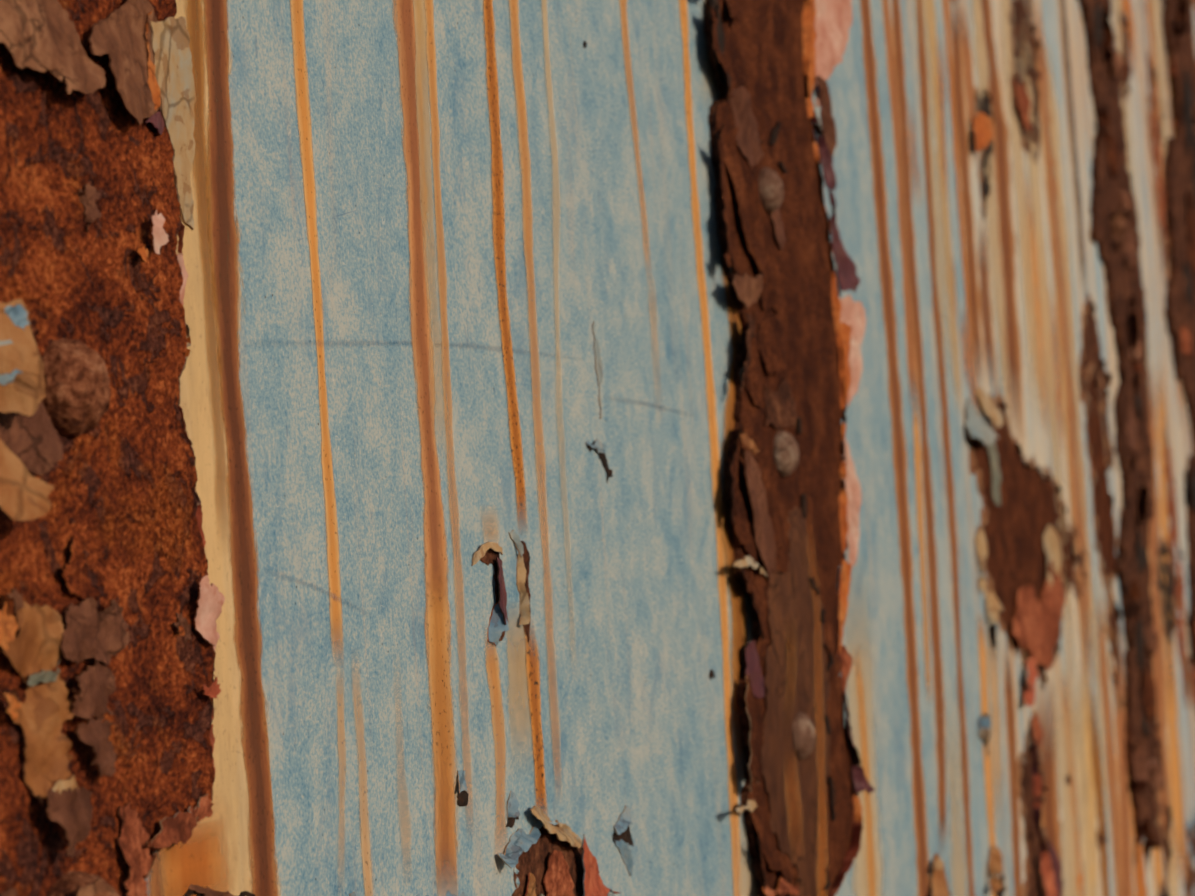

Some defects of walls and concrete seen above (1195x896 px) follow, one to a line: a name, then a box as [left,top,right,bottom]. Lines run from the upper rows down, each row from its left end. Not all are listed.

peeling [0,298,64,521]
corrosion [0,535,129,857]
peeling [0,0,196,305]
corrosion [116,0,281,896]
peeling [195,490,206,548]
corrosion [394,0,458,875]
peeling [471,530,531,646]
corrosion [484,0,546,511]
peeling [497,790,620,896]
corrosion [679,0,836,896]
corrosion [860,0,1195,896]
peeling [965,288,1125,896]